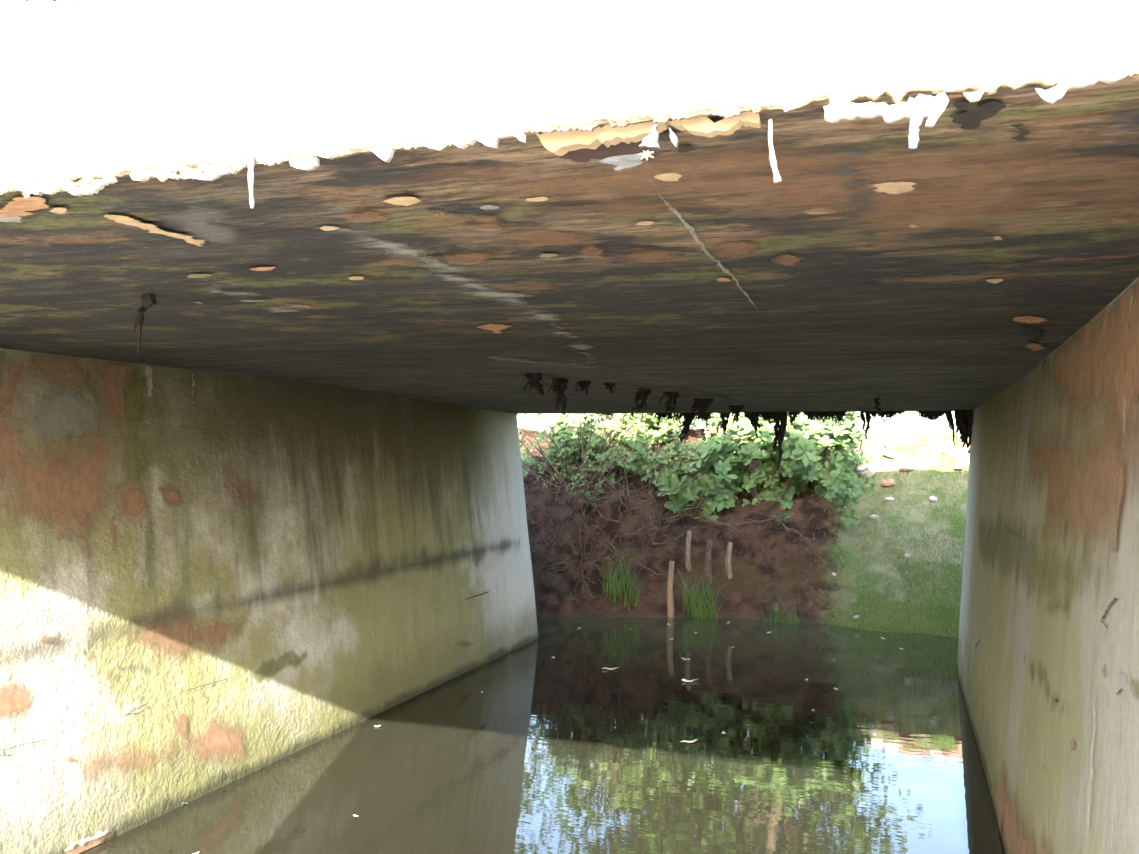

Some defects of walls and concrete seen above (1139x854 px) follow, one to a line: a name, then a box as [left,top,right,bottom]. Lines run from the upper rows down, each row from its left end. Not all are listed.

peeling [824,69,1139,130]
peeling [130,151,247,182]
peeling [289,147,349,171]
peeling [369,142,395,163]
spalling [426,112,761,170]
spalling [654,173,682,181]
spalling [1011,124,1030,141]
spalling [0,168,117,223]
spalling [383,197,421,206]